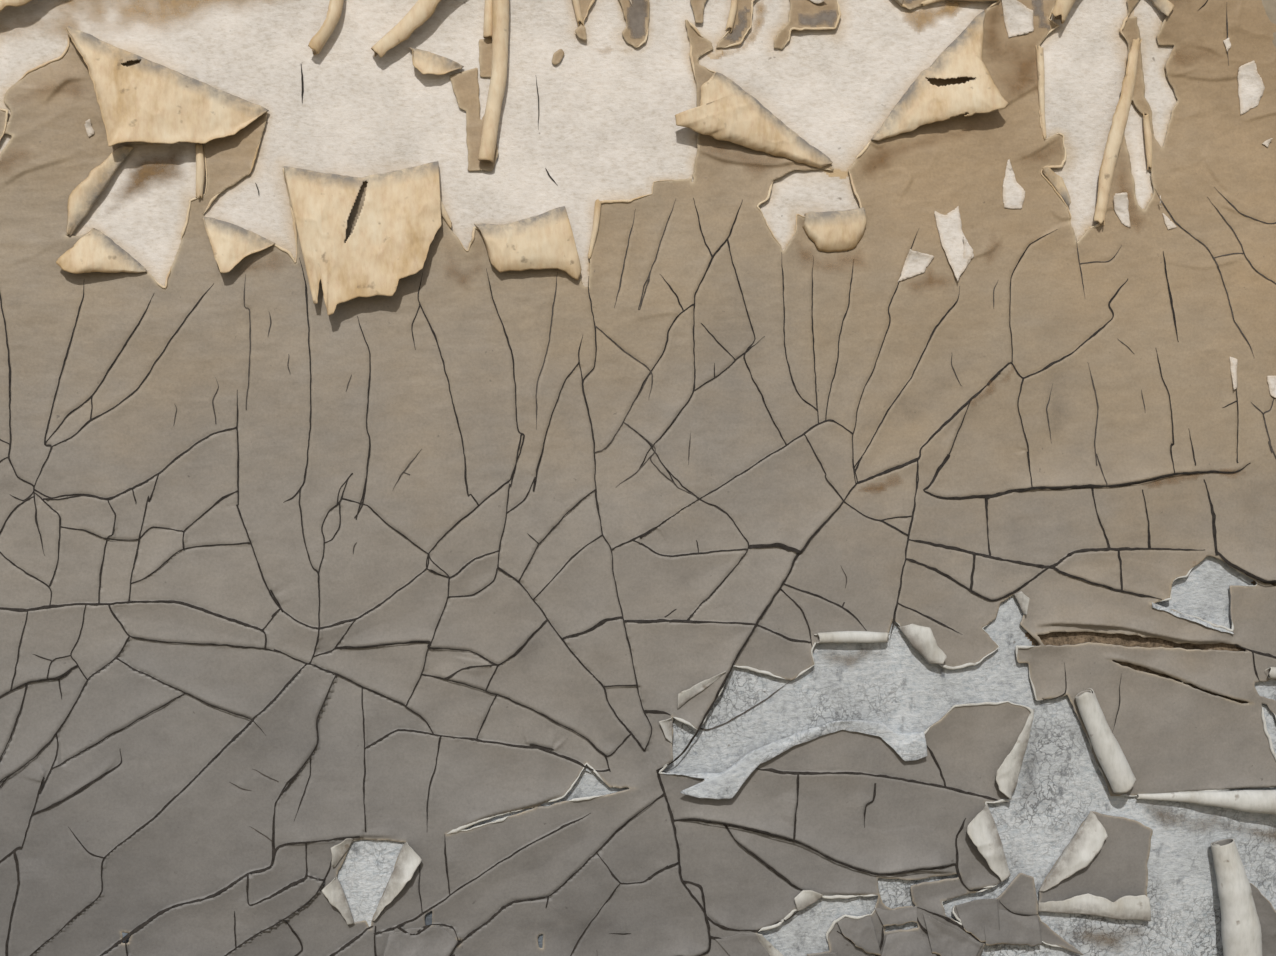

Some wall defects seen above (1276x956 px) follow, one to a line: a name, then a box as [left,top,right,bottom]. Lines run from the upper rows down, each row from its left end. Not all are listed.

peeling [1237,61,1265,115]
peeling [0,0,1177,316]
peeling [1229,357,1238,390]
peeling [1267,376,1276,398]
crack [0,198,1276,956]
peeling [1152,556,1257,635]
peeling [447,763,629,834]
peeling [659,591,1276,956]
peeling [322,838,422,926]